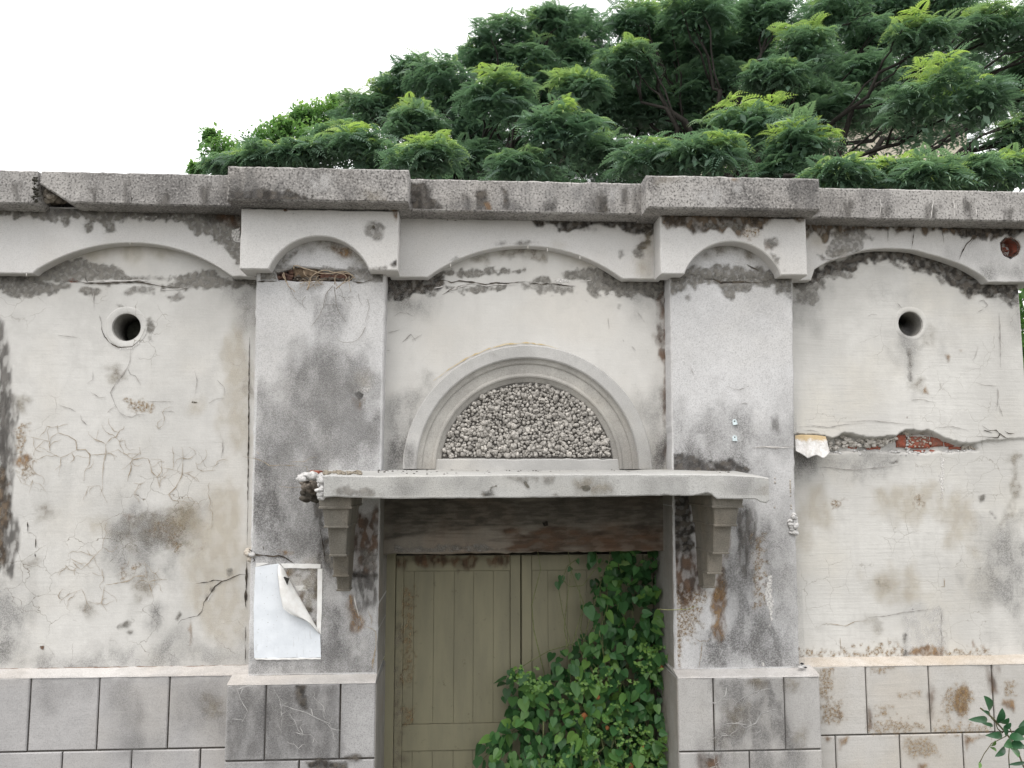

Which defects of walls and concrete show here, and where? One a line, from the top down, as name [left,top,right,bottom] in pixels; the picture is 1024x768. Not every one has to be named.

peeling [0,177,241,264]
peeling [0,258,257,301]
peeling [387,238,792,301]
crack [799,318,1014,438]
leakage [0,323,19,576]
spalling [795,432,976,458]
crack [18,337,314,659]
leakage [314,503,333,572]
rust [674,495,727,665]
leakage [711,510,781,666]
rust [799,643,986,723]
rust [868,686,991,768]